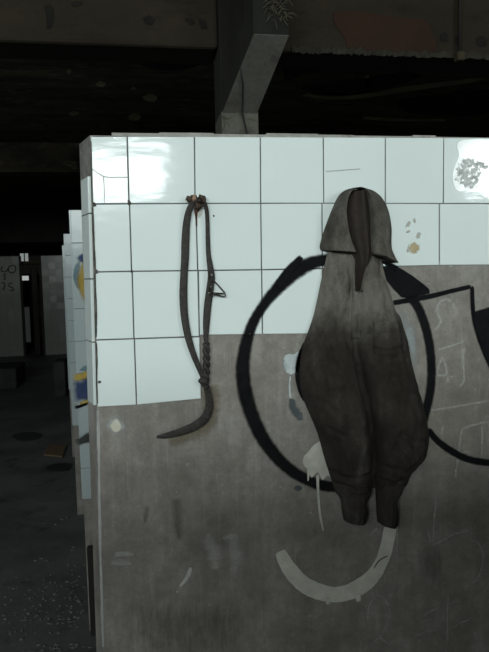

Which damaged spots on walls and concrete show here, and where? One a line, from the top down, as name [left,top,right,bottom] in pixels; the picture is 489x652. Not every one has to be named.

rust [406,218,420,253]